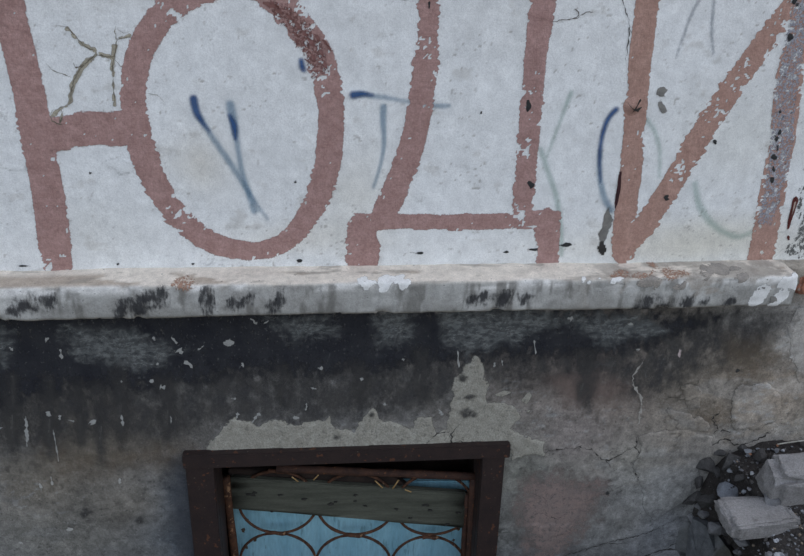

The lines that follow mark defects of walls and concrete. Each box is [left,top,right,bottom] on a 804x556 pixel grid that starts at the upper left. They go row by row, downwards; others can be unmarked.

crack [50,21,131,125]
peeling [700,263,749,283]
peeling [748,187,804,306]
flaking render [788,307,804,383]
flaking render [206,356,545,460]
crack [546,362,643,465]
crack [711,412,772,449]
crack [564,520,674,556]